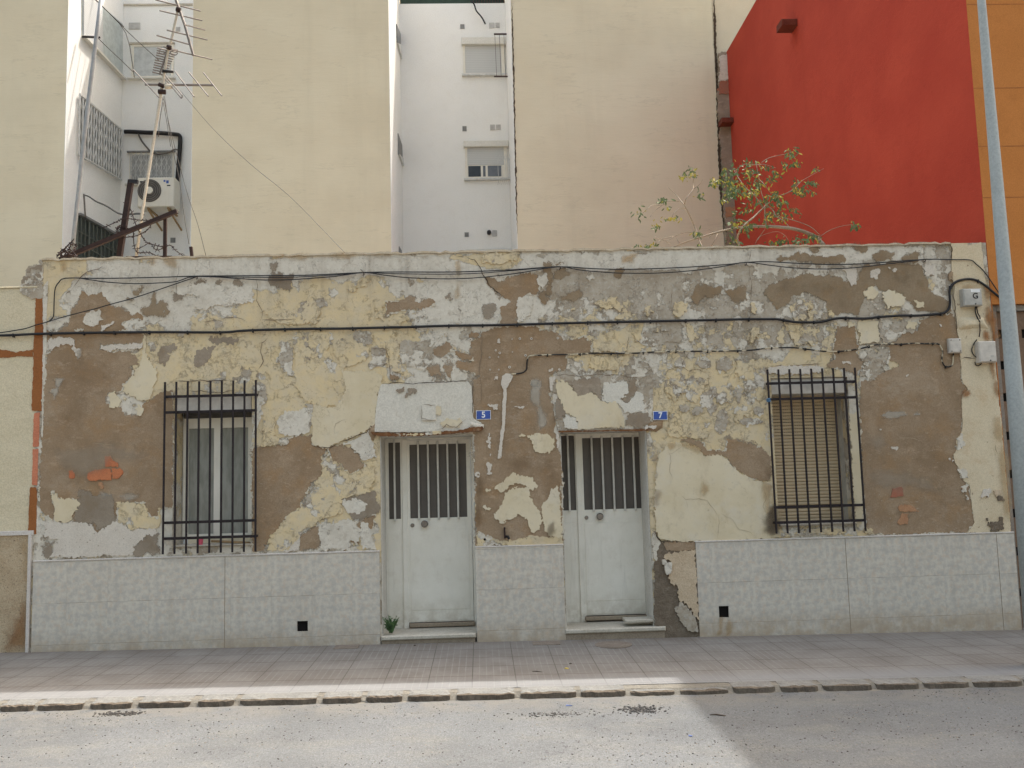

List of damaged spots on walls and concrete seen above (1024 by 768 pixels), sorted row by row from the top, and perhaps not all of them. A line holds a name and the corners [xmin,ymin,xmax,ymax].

flaking render [37,261,670,559]
flaking render [651,243,1005,638]